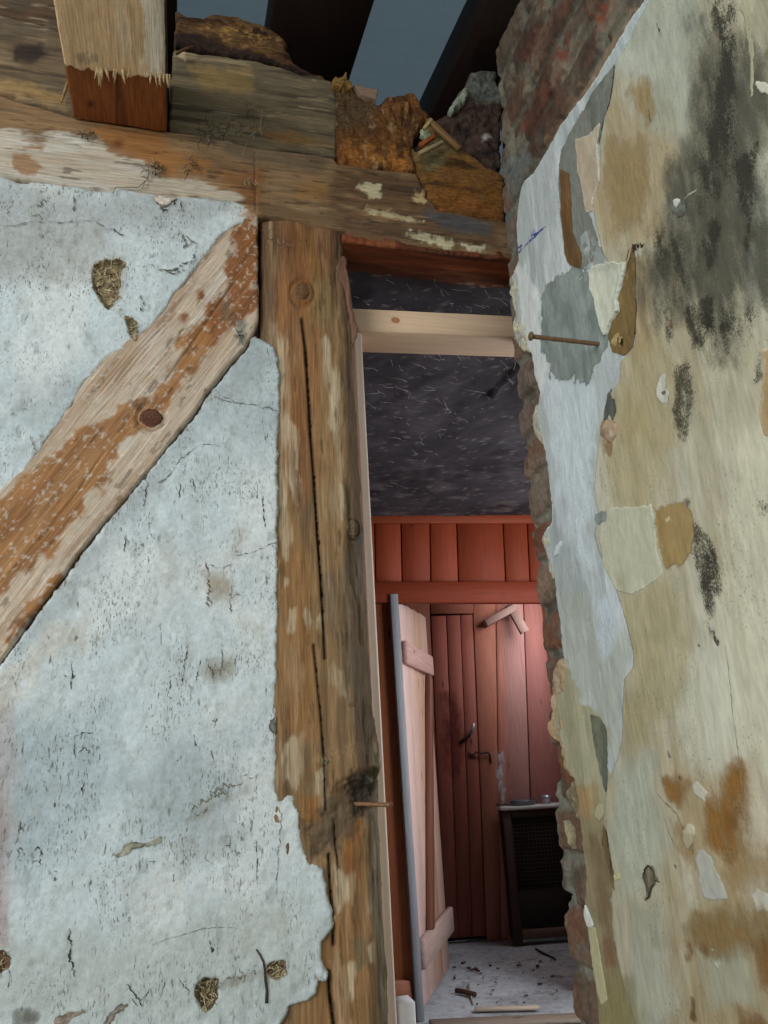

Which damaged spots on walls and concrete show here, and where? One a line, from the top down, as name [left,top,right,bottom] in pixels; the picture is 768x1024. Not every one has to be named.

peeling [558,65,637,356]
damp [640,1,768,354]
flaking render [509,270,531,353]
damp [672,363,696,442]
crack [302,331,338,943]
damp [655,502,722,634]
flaking render [547,658,580,849]
peeling [590,714,608,792]